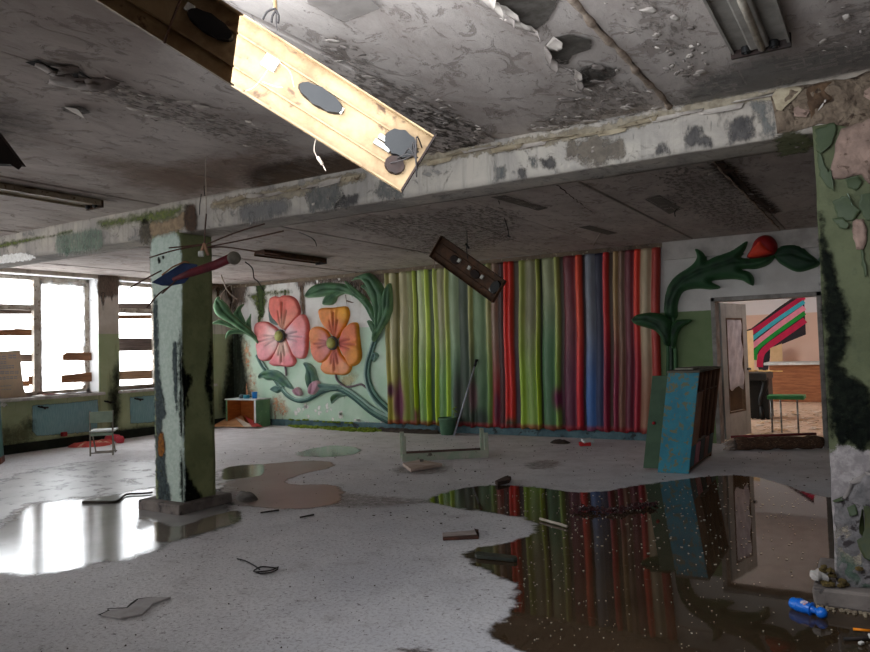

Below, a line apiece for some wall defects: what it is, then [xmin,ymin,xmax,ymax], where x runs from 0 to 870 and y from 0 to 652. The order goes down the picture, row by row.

peeling [64,106,90,119]
spalling [319,0,870,184]
damp [111,155,361,193]
peeling [210,172,366,213]
peeling [375,180,403,200]
spalling [852,219,867,250]
damp [212,283,247,313]
mould [817,213,870,451]
damp [109,204,202,503]
damp [205,334,252,422]
spalling [832,470,870,588]